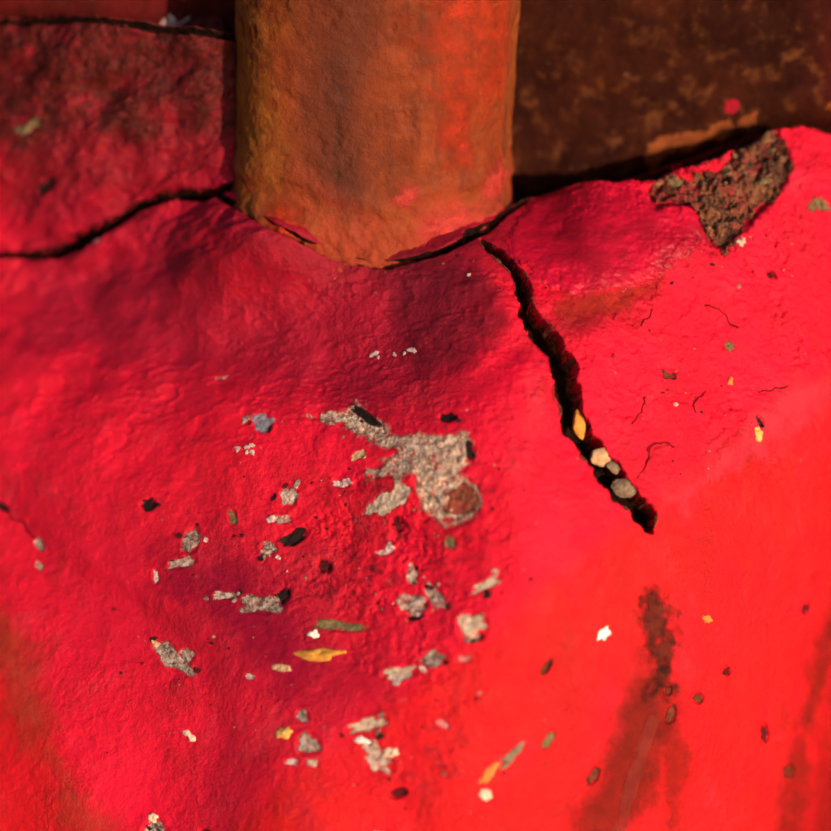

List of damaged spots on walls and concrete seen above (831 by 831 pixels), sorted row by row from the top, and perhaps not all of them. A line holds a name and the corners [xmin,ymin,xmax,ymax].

crack [634,126,815,181]
crack [0,182,245,260]
crack [265,217,324,250]
spalling [649,130,795,256]
crack [705,305,739,329]
crack [356,180,675,532]
crack [758,385,789,393]
spalling [307,399,482,549]
spalling [257,515,306,562]
peeling [213,588,290,625]
peeling [396,563,451,621]
peeling [340,712,399,782]